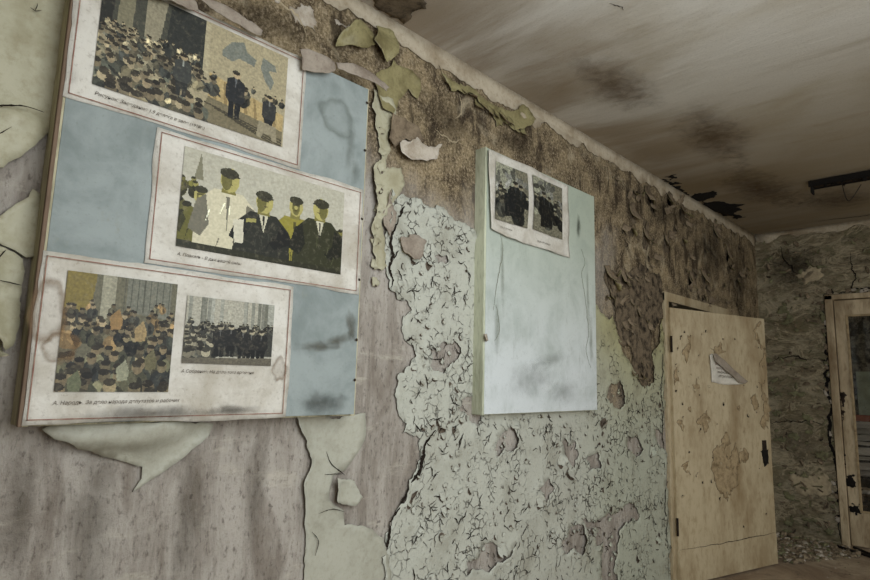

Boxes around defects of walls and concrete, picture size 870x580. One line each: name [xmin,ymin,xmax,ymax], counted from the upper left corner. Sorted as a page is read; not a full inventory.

peeling [0,0,65,168]
peeling [373,0,427,24]
peeling [296,59,751,580]